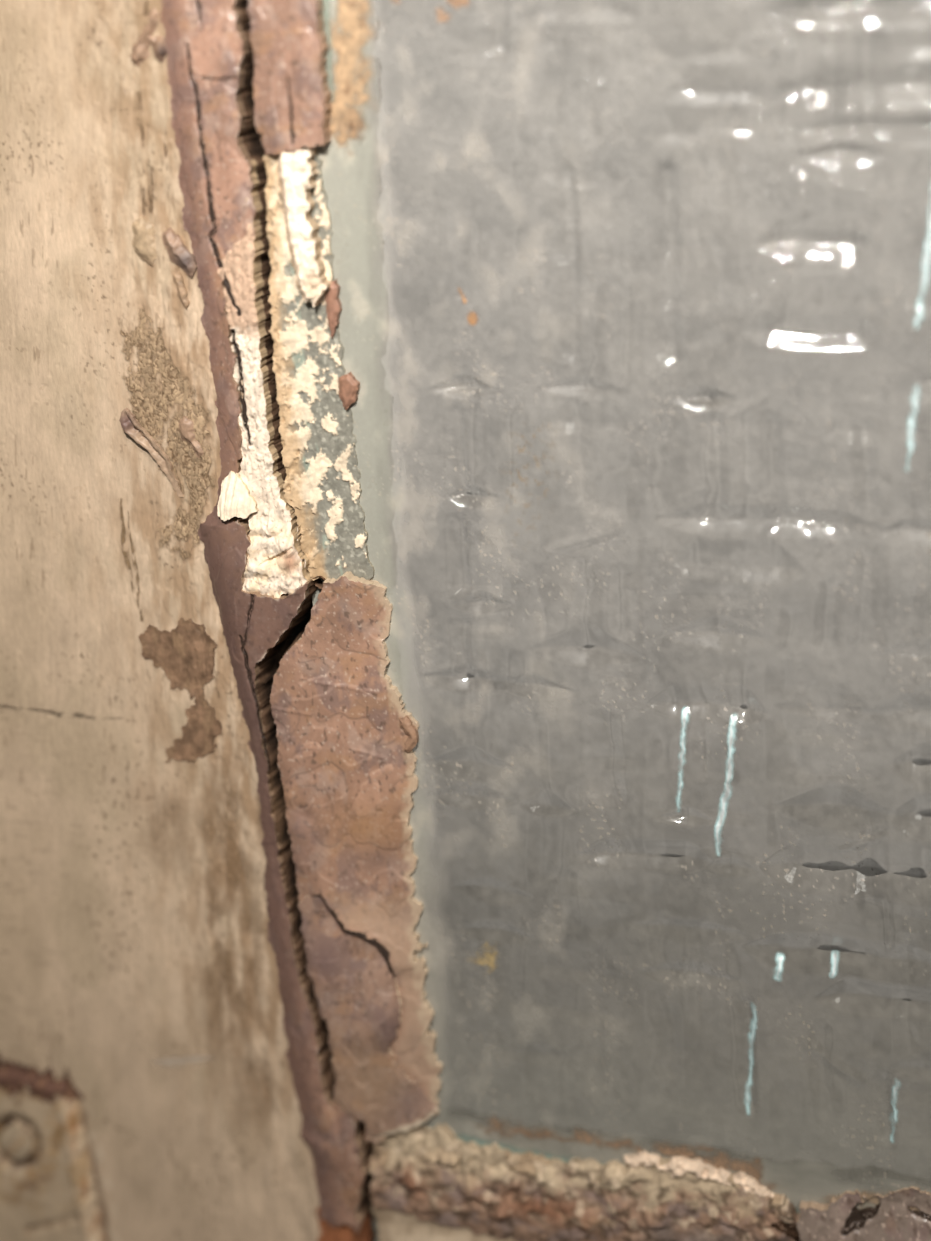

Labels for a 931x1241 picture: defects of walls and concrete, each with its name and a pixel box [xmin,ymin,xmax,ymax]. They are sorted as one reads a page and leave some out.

rust [330,0,372,145]
crack [187,0,295,483]
peeling [325,279,342,338]
peeling [338,372,360,410]
peeling [217,471,259,521]
crack [240,576,336,1100]
rust [0,1058,84,1103]
crack [358,1121,377,1241]
crack [841,1200,931,1236]